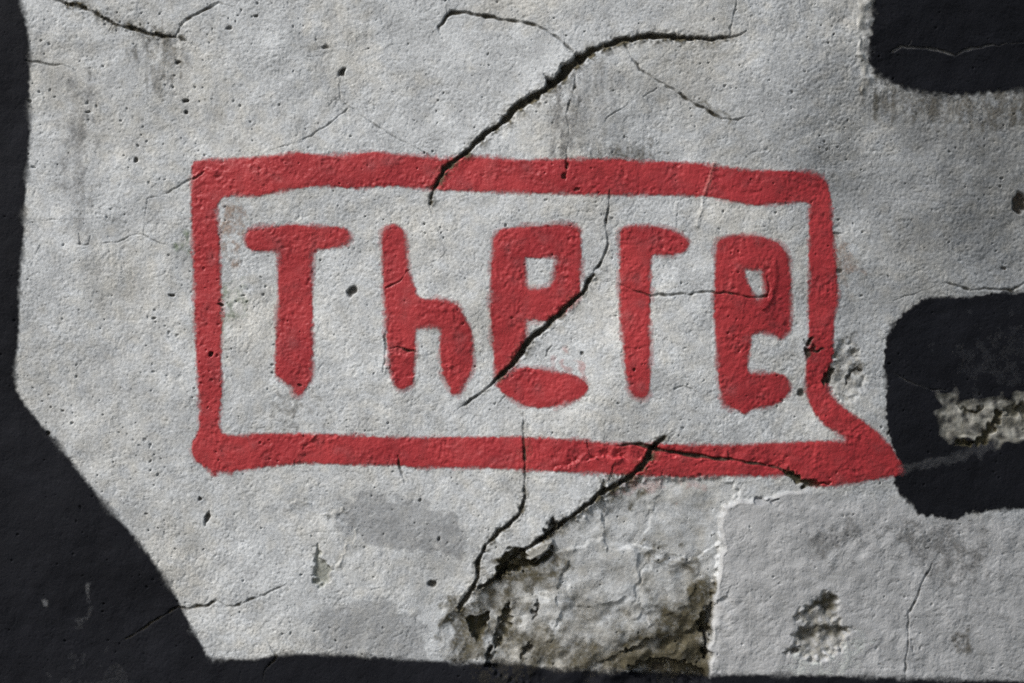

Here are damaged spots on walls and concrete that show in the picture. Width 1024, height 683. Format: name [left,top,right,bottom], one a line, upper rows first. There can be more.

crack [60,1,210,40]
crack [438,11,536,29]
crack [429,33,727,205]
crack [465,216,608,405]
spalling [938,392,1024,447]
spalling [438,517,717,677]
crack [458,436,784,612]
spalling [790,594,847,659]